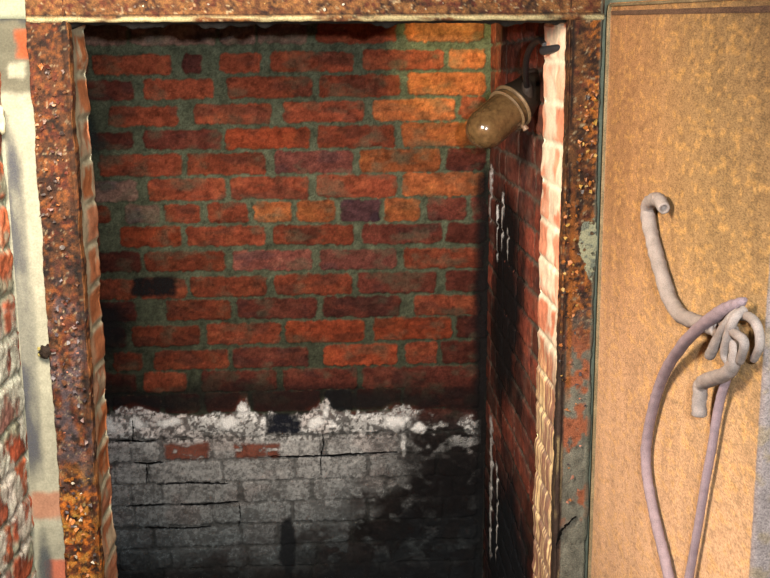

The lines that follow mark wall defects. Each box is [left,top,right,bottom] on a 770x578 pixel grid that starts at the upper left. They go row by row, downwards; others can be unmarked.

rust [34,91,68,223]
rust [567,84,598,194]
rust [561,237,580,321]
rust [47,296,86,408]
rust [59,477,97,569]
water stain [106,399,531,578]